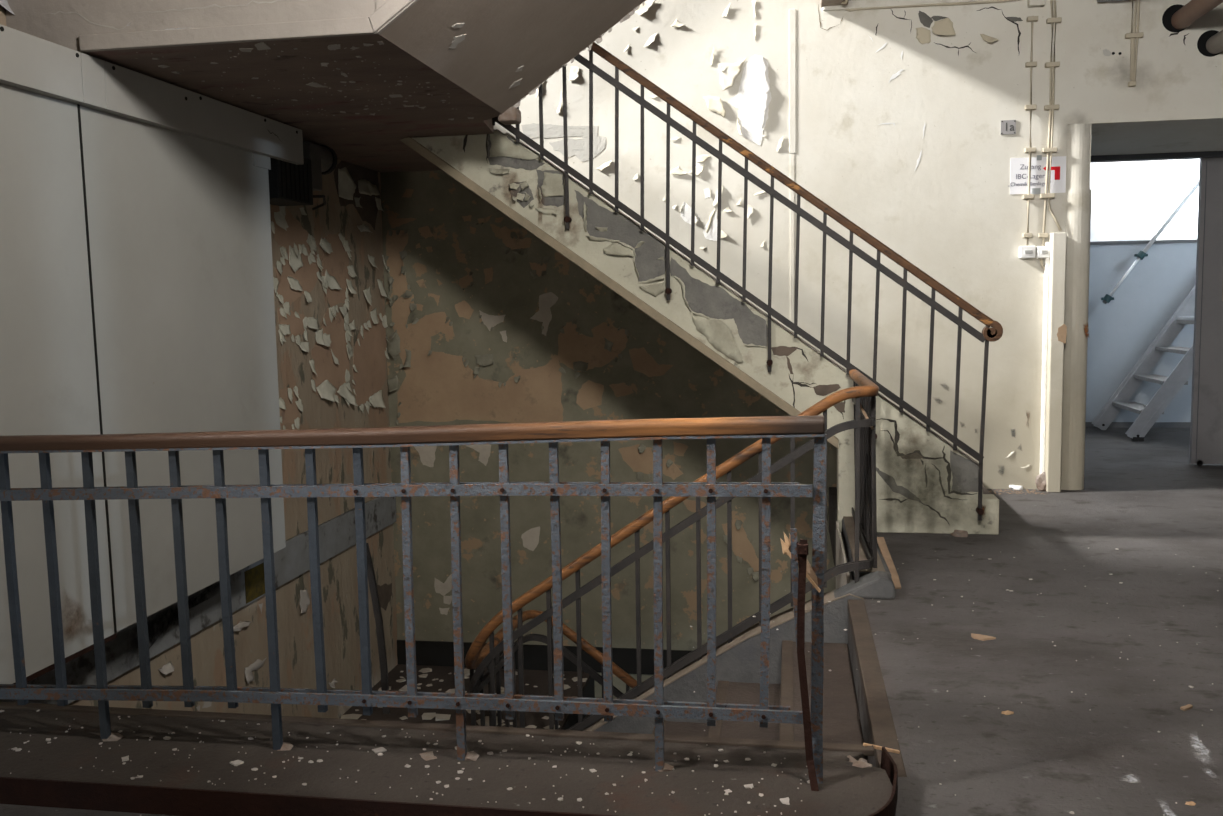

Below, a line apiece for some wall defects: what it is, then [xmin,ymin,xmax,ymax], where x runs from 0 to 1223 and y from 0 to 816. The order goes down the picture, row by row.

crack [875,10,976,56]
crack [977,6,1023,52]
peeling [487,0,841,396]
peeling [271,160,566,430]
crack [792,375,845,419]
peeling [414,446,437,467]
peeling [618,441,688,481]
crack [876,418,979,500]
peeling [521,526,540,551]
peeling [717,519,759,581]
peeling [434,574,452,615]
spalling [784,549,831,602]